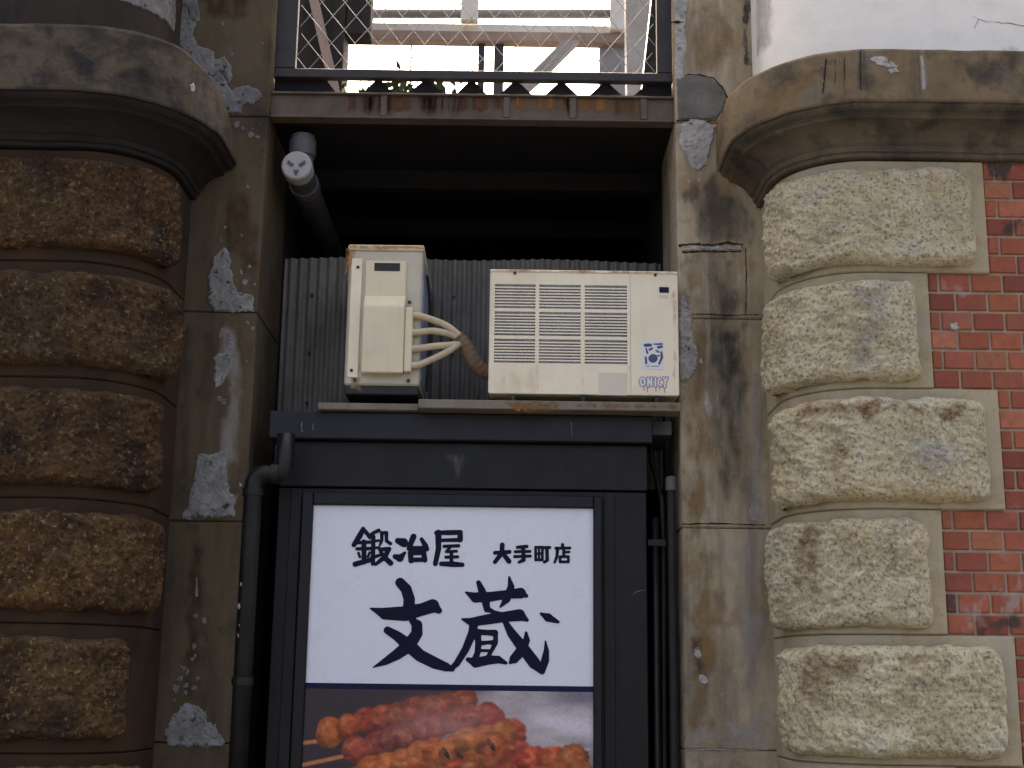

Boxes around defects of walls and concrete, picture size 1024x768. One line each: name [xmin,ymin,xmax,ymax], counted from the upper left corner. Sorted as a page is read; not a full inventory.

flaking render [120,0,262,139]
rust [349,95,443,114]
rust [515,98,640,115]
flaking render [679,119,716,183]
flaking render [207,225,256,331]
flaking render [213,328,248,406]
flaking render [678,295,703,388]
flaking render [181,451,242,520]
damp [695,576,721,675]
flaking render [164,642,225,748]